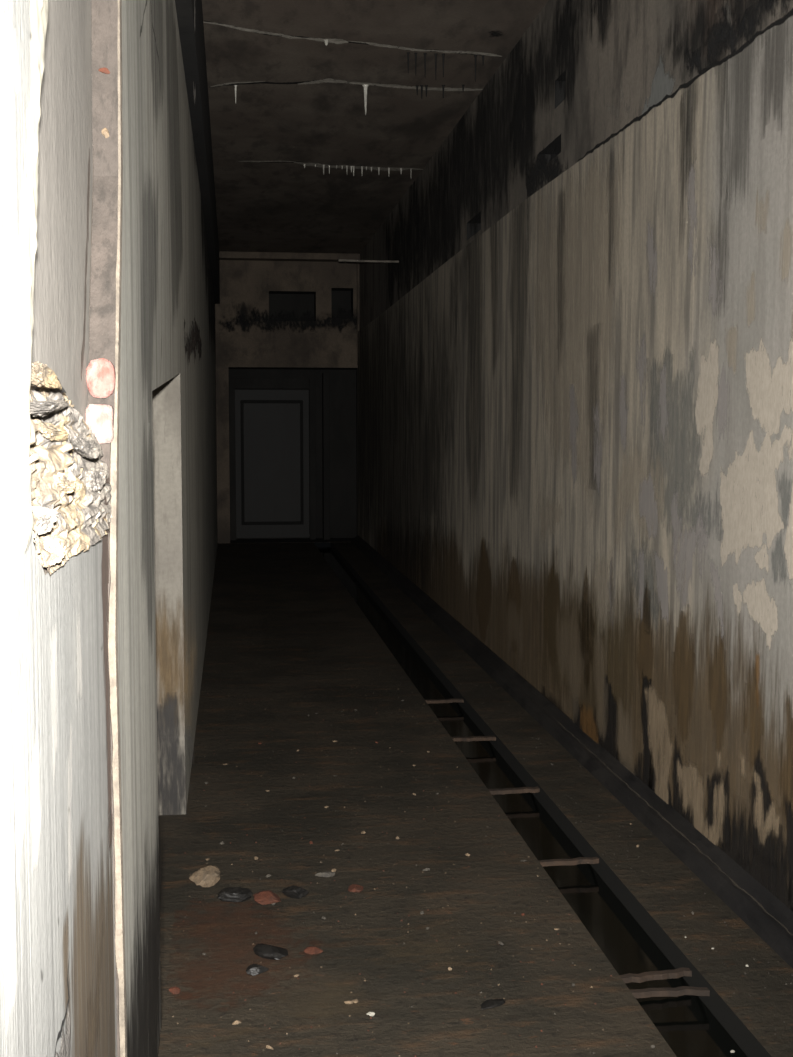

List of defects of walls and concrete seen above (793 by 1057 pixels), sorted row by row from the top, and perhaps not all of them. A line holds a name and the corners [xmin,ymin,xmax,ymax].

crack [579,9,793,160]
peeling [695,337,793,651]
damp [378,523,793,911]
crack [55,962,70,1054]